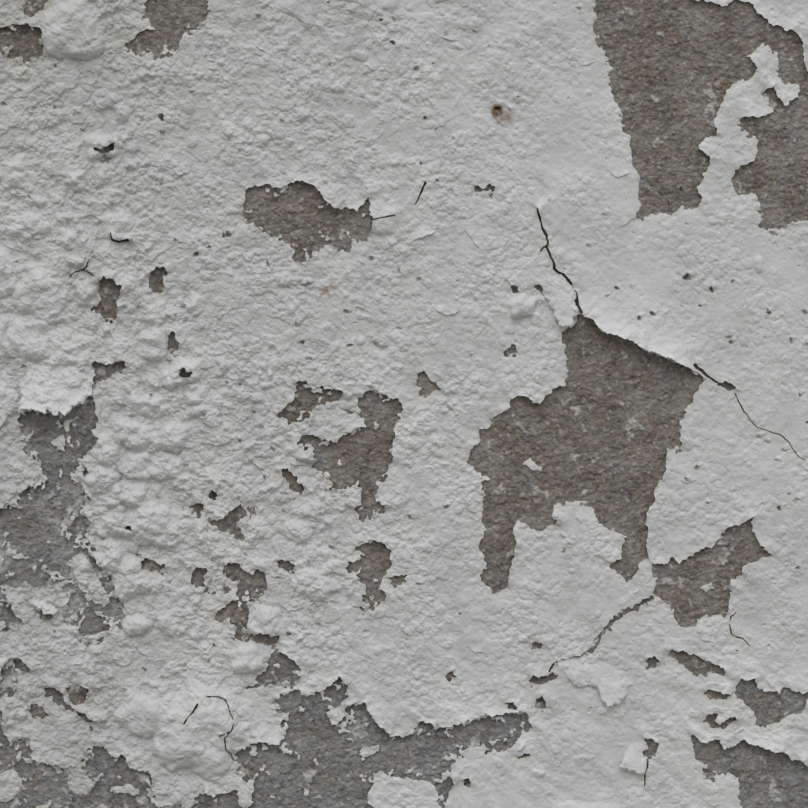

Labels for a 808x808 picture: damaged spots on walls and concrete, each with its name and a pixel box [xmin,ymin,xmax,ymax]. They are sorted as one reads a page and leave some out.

peeling [0,0,52,66]
peeling [125,0,218,61]
peeling [593,0,808,236]
peeling [239,175,376,265]
crack [537,207,583,314]
peeling [0,353,134,652]
peeling [277,374,408,522]
peeling [346,534,411,615]
peeling [467,272,778,628]
crack [693,363,805,460]
peeling [0,555,632,808]
peeling [643,644,808,808]